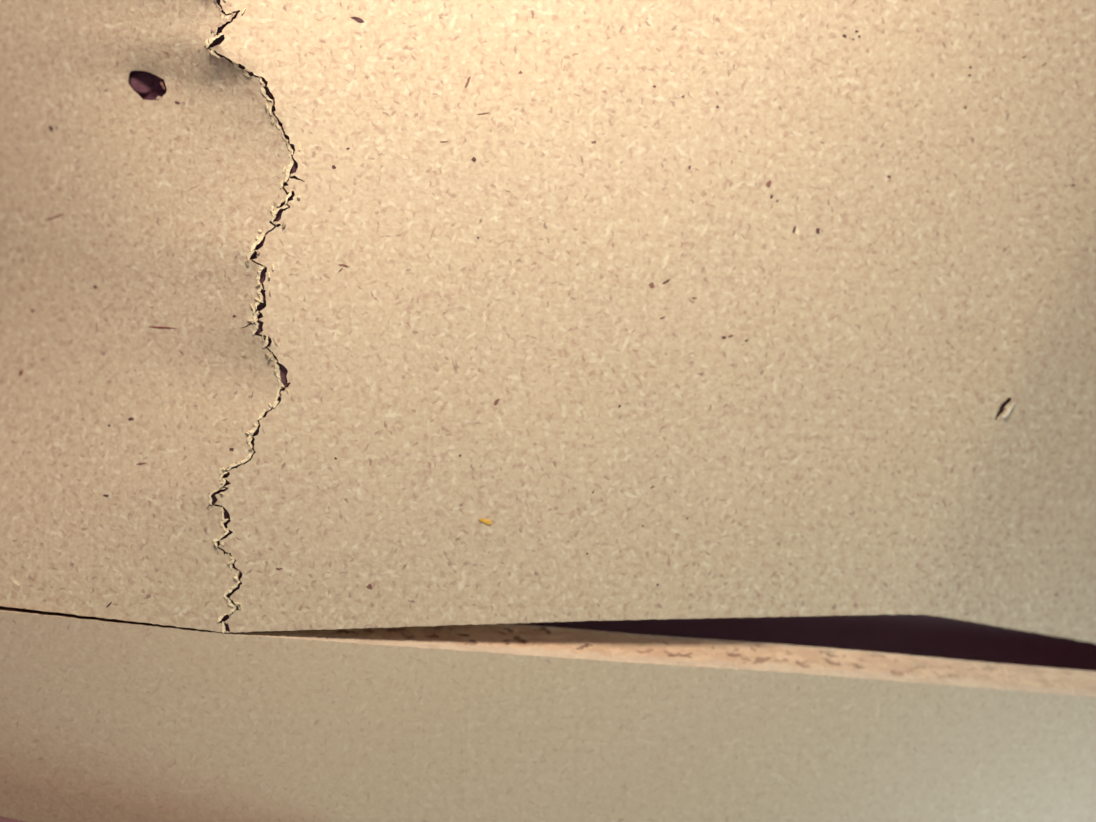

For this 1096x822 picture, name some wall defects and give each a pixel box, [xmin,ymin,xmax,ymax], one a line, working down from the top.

crack [204,0,305,634]